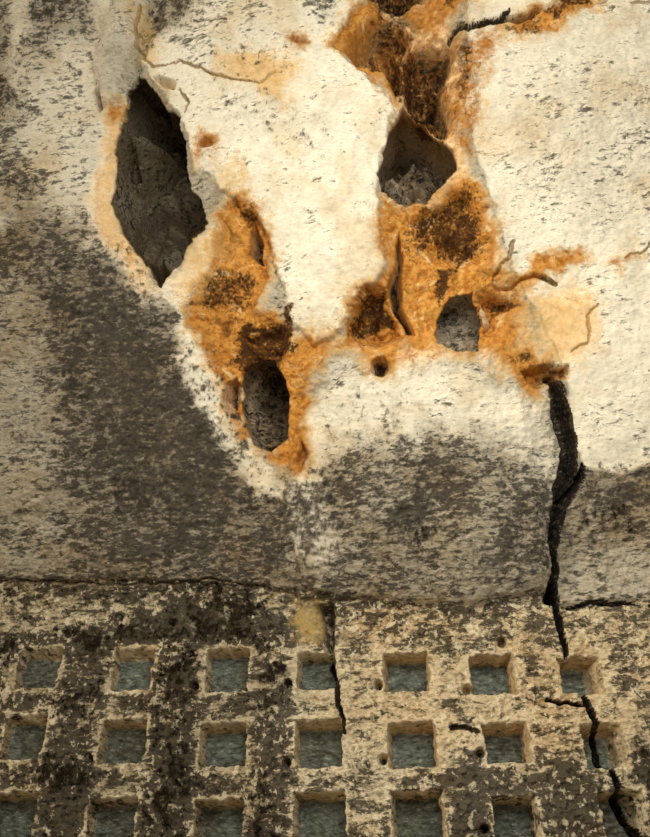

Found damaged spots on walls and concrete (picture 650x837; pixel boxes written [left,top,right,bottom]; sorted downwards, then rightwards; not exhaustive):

leakage [0,50,24,131]
leakage [24,0,92,49]
leakage [145,0,216,50]
corrosion [324,0,477,112]
corrosion [436,0,604,157]
corrosion [180,176,590,478]
leakage [29,244,475,589]
leakage [448,462,561,584]
crack [541,374,650,660]
crack [330,664,347,734]
crack [545,694,646,837]